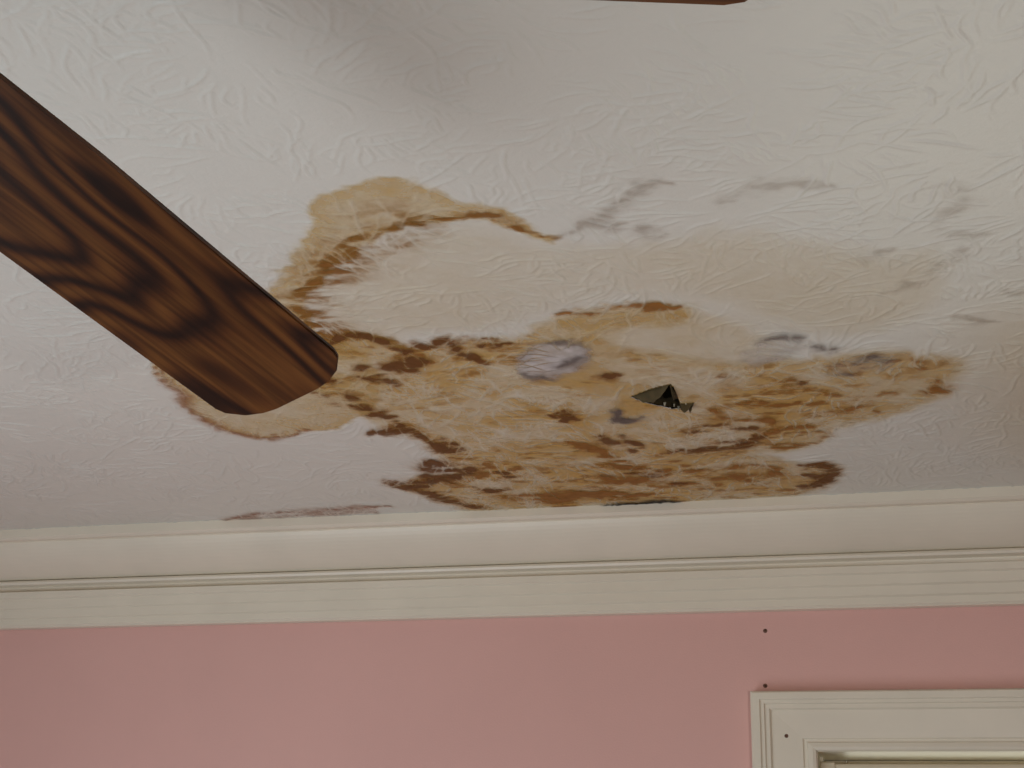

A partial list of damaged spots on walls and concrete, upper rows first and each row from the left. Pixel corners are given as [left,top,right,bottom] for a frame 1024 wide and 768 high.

leakage [155,178,951,510]
peeling [632,384,694,413]